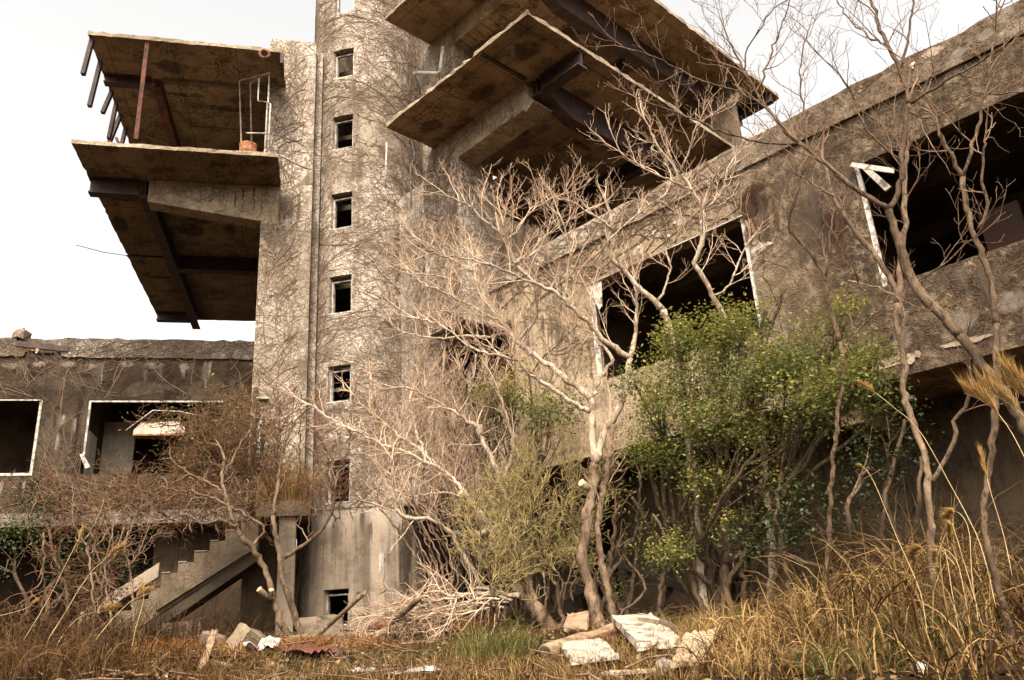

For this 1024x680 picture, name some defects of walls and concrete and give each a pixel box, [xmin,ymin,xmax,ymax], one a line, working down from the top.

corrosion [738,182,779,243]